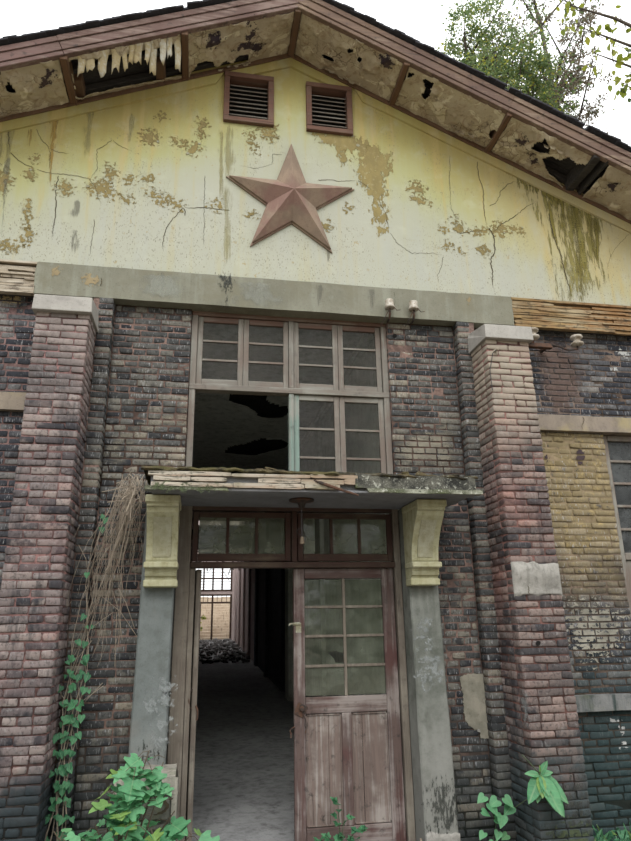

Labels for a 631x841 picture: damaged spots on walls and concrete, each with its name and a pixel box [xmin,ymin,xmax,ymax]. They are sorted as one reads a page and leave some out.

peeling [170,115,212,158]
peeling [242,124,280,156]
peeling [0,198,37,255]
peeling [0,153,41,195]
crack [8,129,128,234]
peeling [52,162,189,215]
crack [162,178,230,245]
peeling [306,131,393,237]
peeling [405,179,433,207]
crack [449,160,531,285]
crack [549,215,571,293]
damp [517,179,611,301]